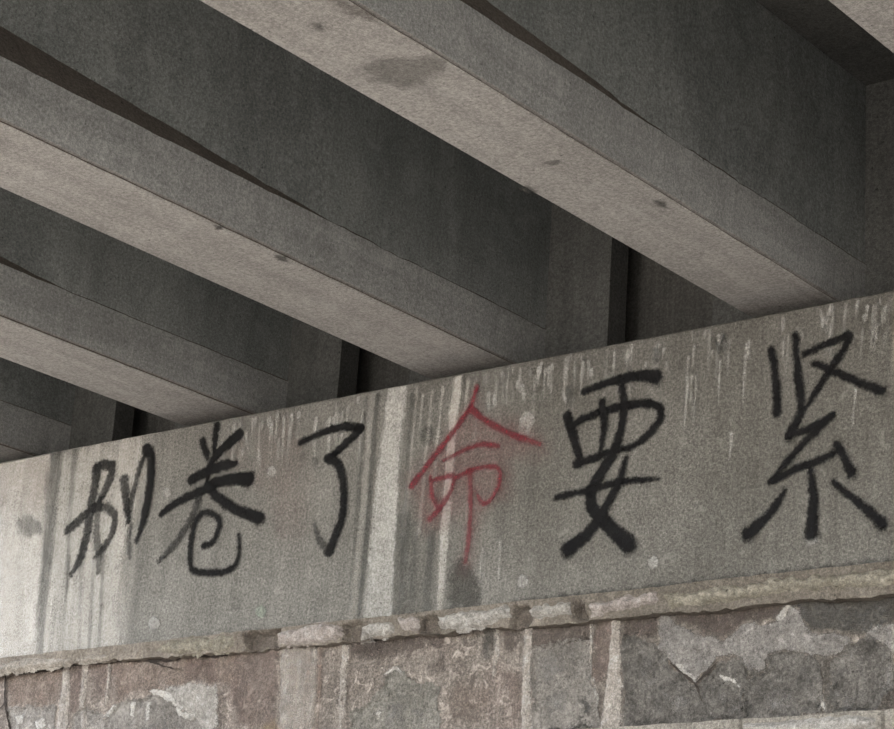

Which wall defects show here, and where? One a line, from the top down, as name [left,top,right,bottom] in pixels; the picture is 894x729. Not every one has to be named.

water stain [0,437,141,658]
water stain [365,386,407,618]
water stain [443,376,461,503]
water stain [449,560,479,609]
spalling [70,683,218,729]
spalling [620,605,894,726]